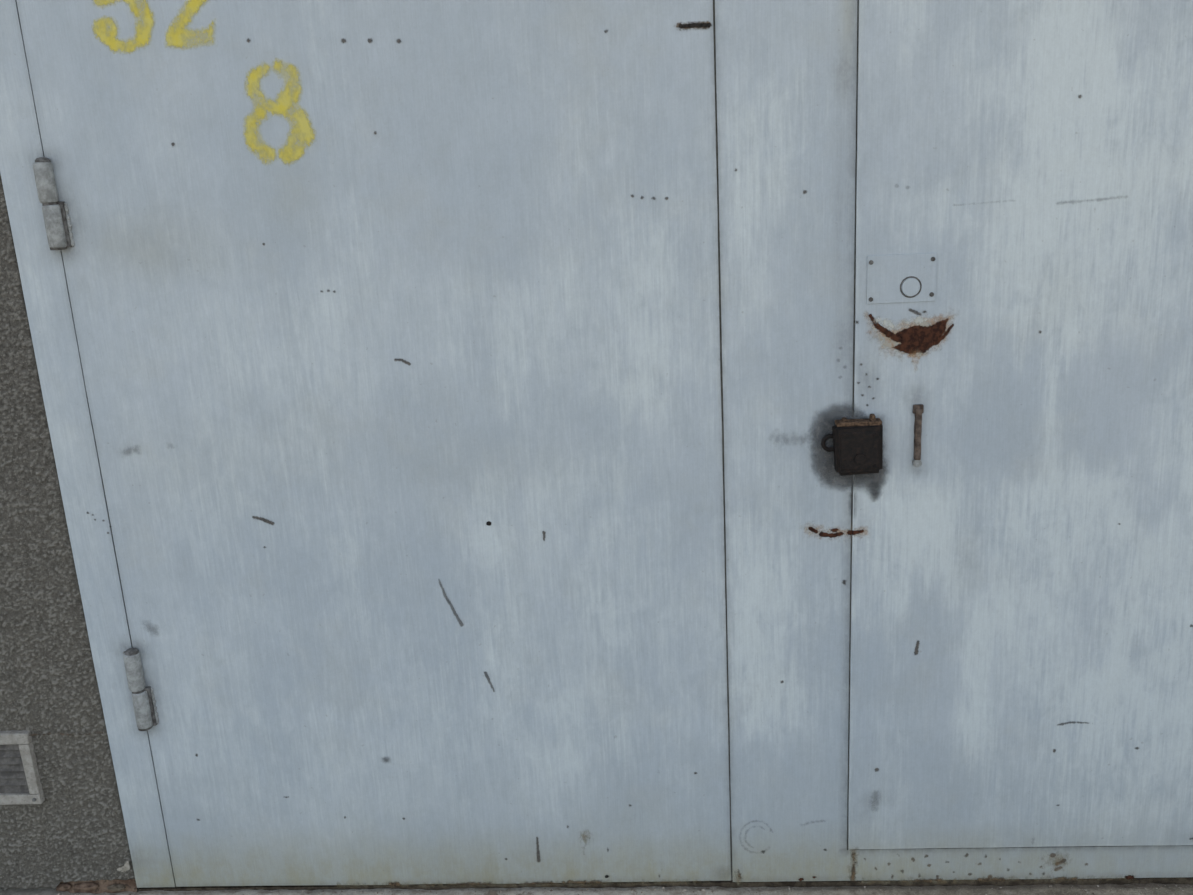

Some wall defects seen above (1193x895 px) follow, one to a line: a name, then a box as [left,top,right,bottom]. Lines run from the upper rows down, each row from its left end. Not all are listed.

rust [869,309,954,354]
rust [808,527,864,538]